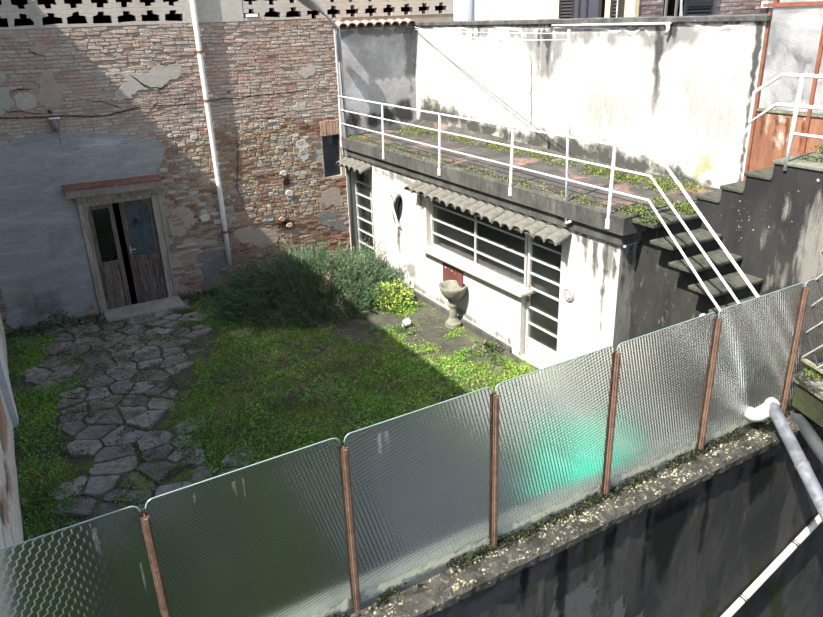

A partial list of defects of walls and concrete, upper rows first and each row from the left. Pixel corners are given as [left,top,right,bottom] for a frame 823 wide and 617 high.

crack [0,62,332,119]
leakage [340,27,416,90]
leakage [428,21,763,182]
leakage [346,98,710,186]
leakage [575,233,637,297]
leakage [744,445,788,520]
leakage [641,479,712,583]
leakage [745,596,754,617]
leakage [749,563,760,581]
leakage [765,482,801,617]